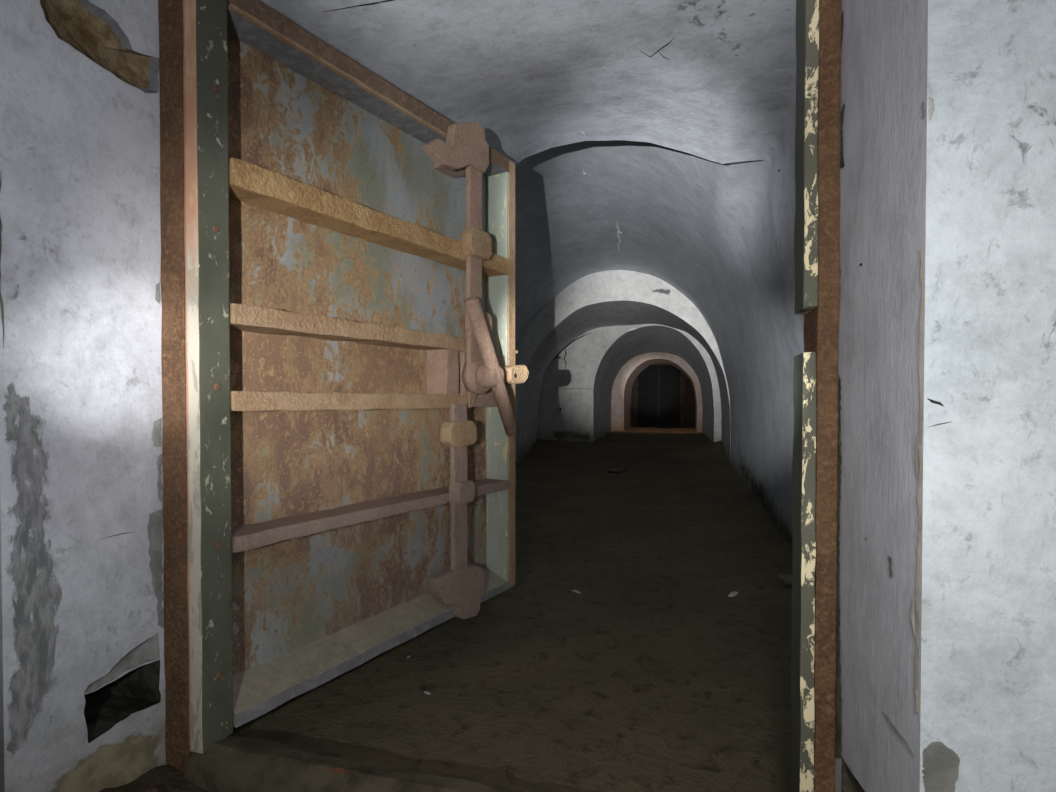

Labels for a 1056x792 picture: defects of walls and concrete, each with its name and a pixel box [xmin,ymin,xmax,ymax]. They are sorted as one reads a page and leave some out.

crack [325,0,394,12]
crack [0,218,8,348]
flaking render [4,384,62,755]
spalling [52,418,164,792]
flaking render [835,375,865,792]
flaking render [909,742,960,792]